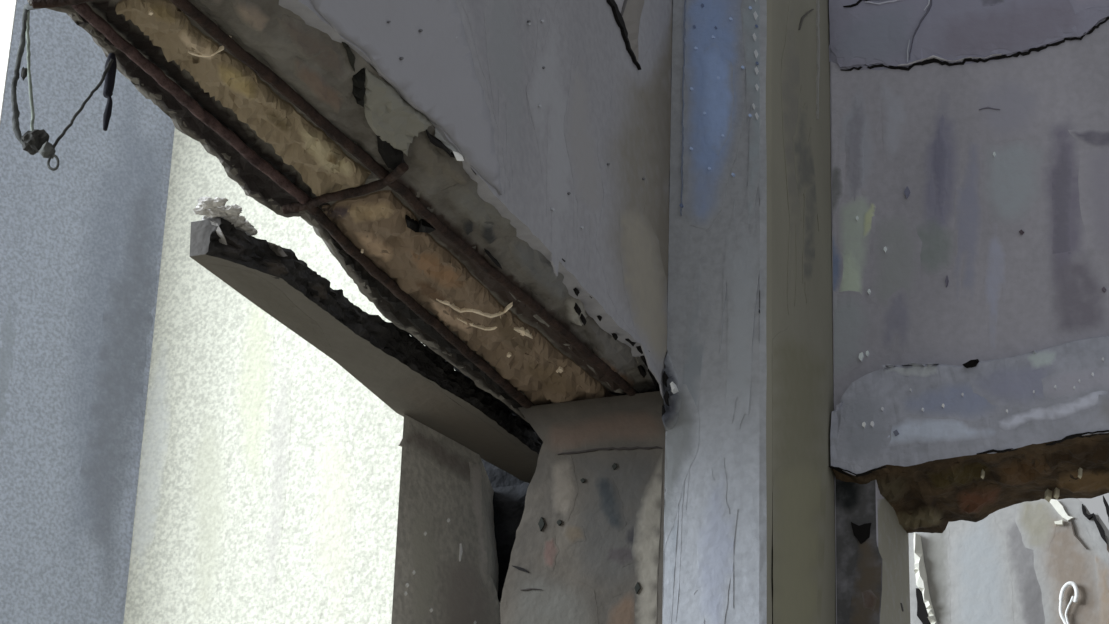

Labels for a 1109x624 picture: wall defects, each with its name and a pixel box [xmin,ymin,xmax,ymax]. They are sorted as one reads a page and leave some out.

spalling [71,0,682,431]
rust [334,140,628,396]
crack [606,0,642,70]
leakage [781,0,819,315]
crack [798,0,1109,119]
leakage [829,0,1109,466]
spalling [1044,468,1109,526]